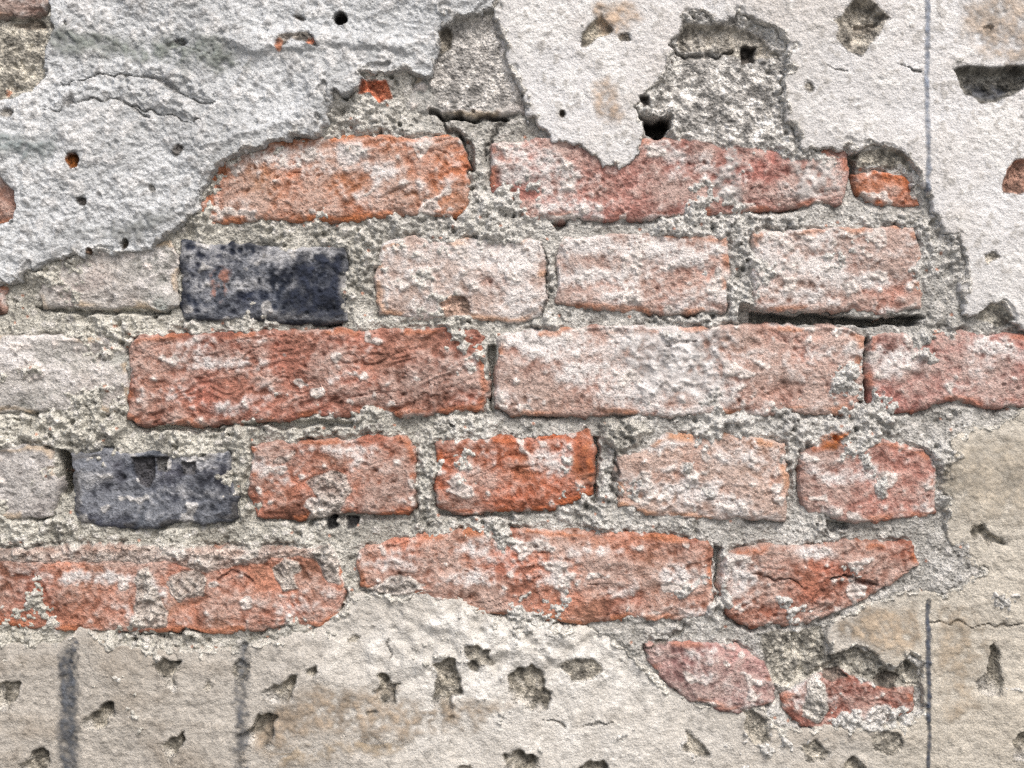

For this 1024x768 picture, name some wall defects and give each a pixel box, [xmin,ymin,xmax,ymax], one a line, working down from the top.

flaking render [0,0,1024,332]
flaking render [0,407,1024,768]
crack [763,574,803,588]
crack [829,574,879,587]